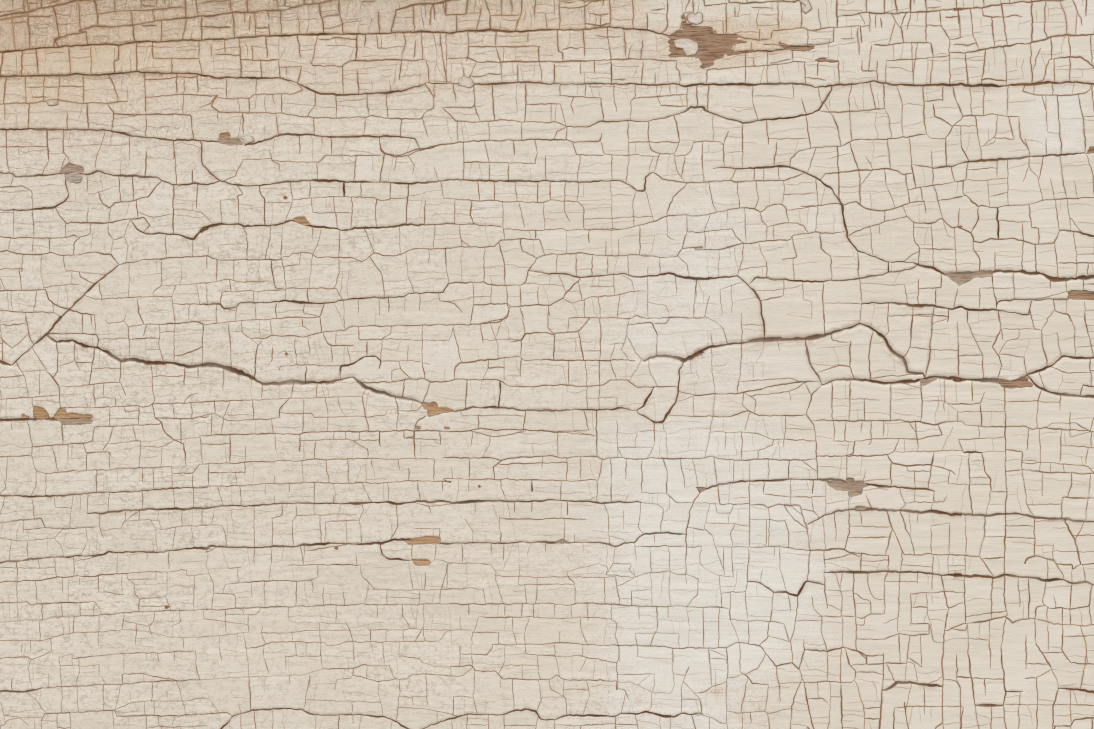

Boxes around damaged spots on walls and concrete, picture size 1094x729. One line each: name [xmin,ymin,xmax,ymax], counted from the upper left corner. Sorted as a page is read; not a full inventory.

peeling [667,12,754,68]
crack [607,306,687,336]
crack [330,321,410,373]
peeling [21,405,92,425]
peeling [421,401,454,417]
crack [0,417,96,474]
peeling [826,478,868,510]
peeling [404,536,441,545]
crack [463,517,556,557]
crack [0,544,133,591]
crack [206,540,733,729]
crack [0,598,204,729]